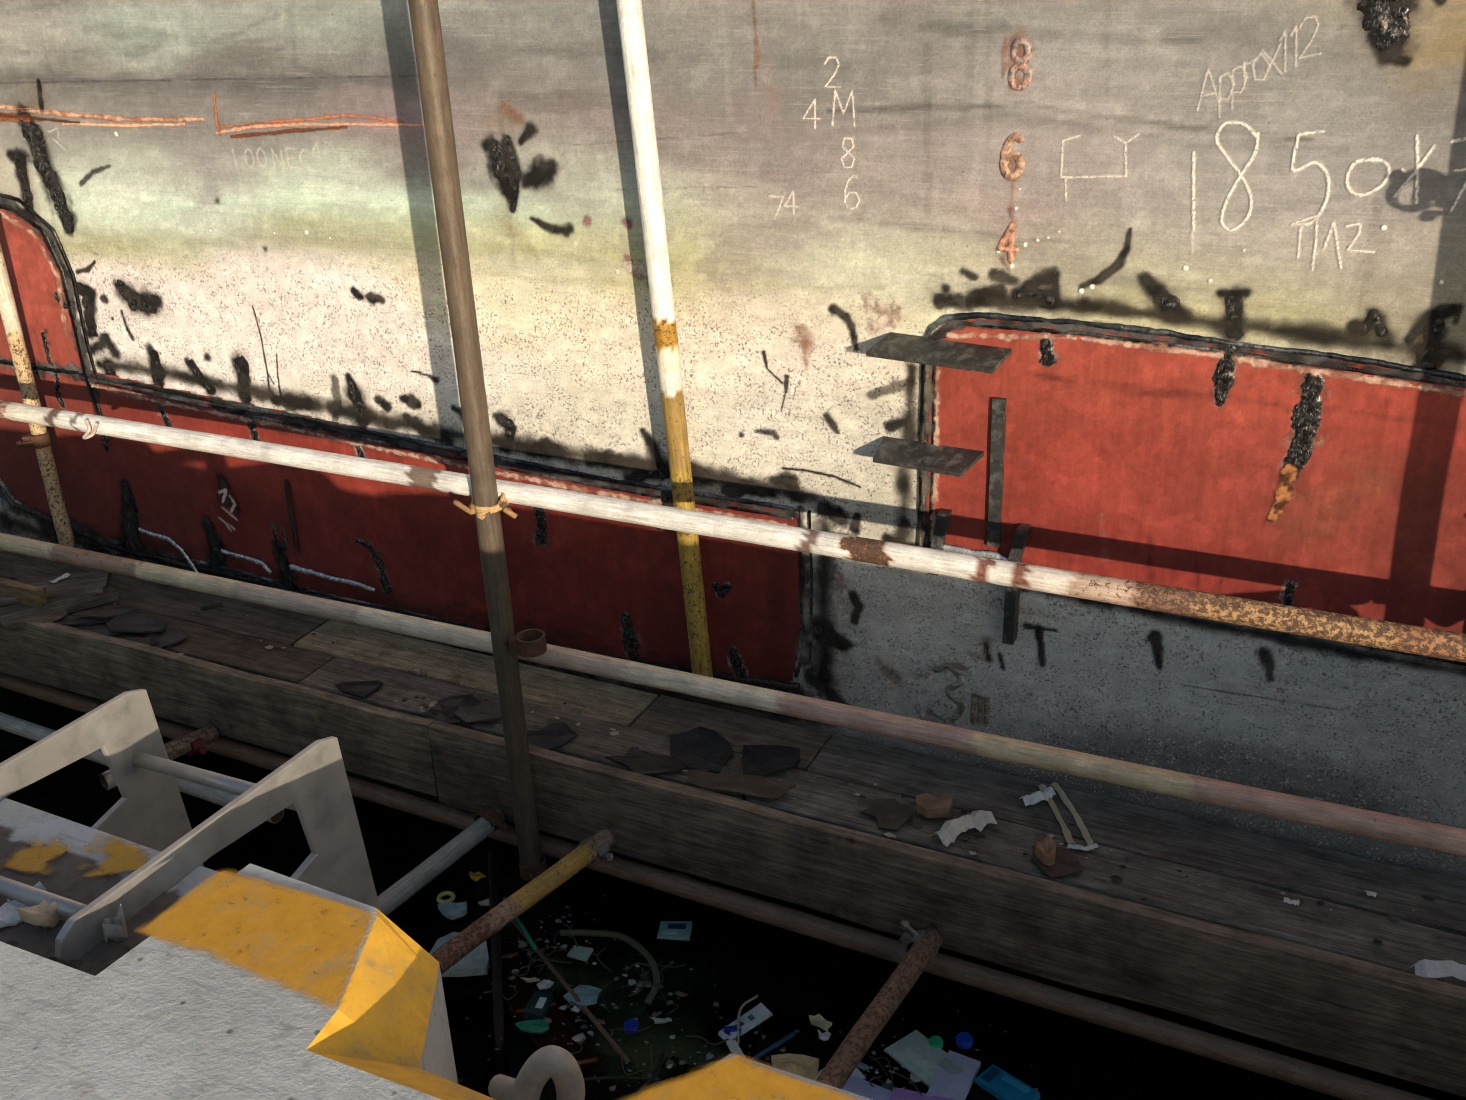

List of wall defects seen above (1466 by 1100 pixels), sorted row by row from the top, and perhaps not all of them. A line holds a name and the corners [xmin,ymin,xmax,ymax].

rust [1267,464,1299,523]